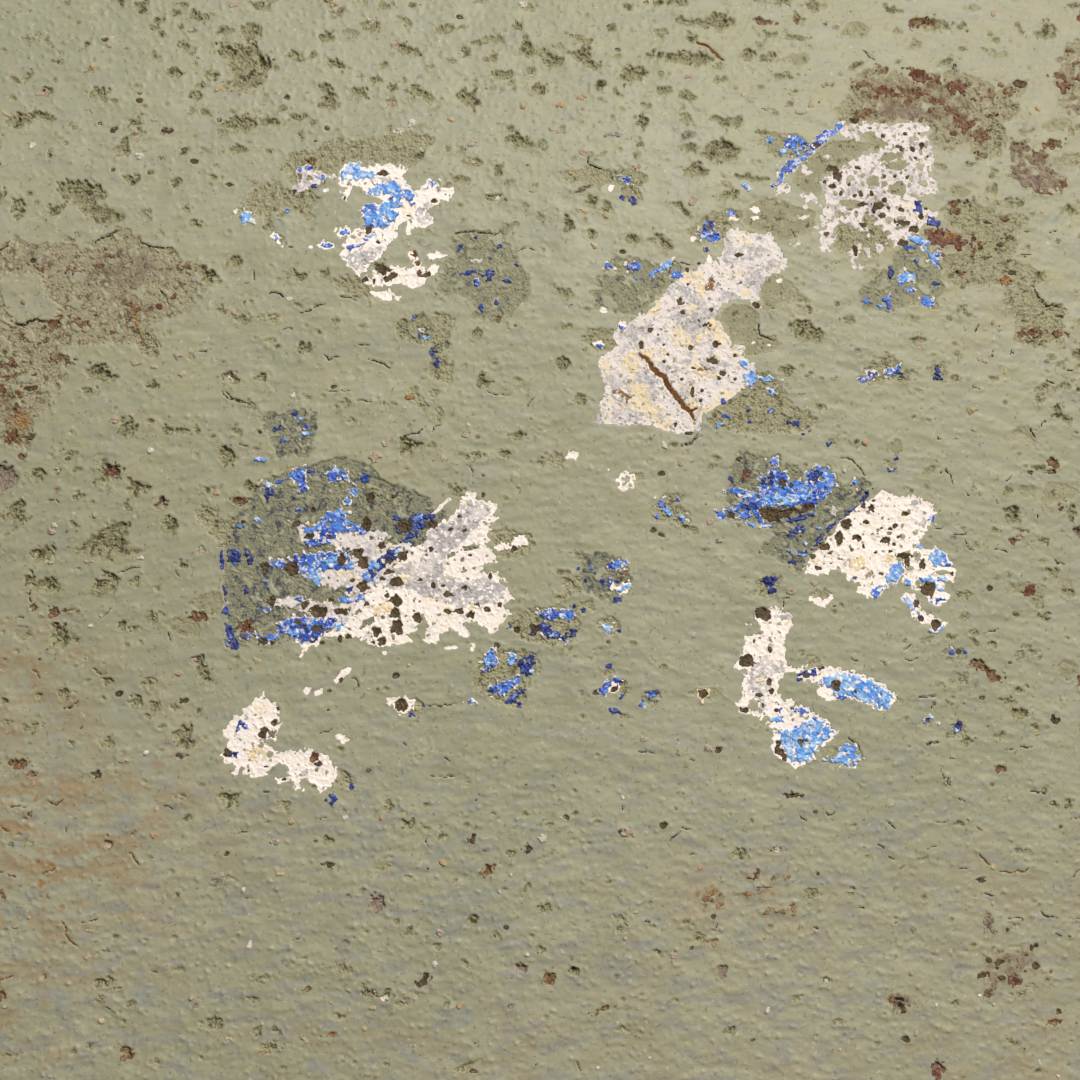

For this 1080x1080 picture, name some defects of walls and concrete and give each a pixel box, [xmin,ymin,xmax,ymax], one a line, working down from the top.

rust [1047,39,1080,118]
rust [833,63,1080,195]
rust [0,226,212,454]
peeling [0,0,1080,782]
crack [638,353,698,447]
spalling [213,788,243,821]
spalling [460,812,496,879]
spalling [505,784,581,862]
spalling [730,842,790,865]
spalling [798,872,825,907]
spalling [1028,780,1075,812]
spalling [652,904,723,963]